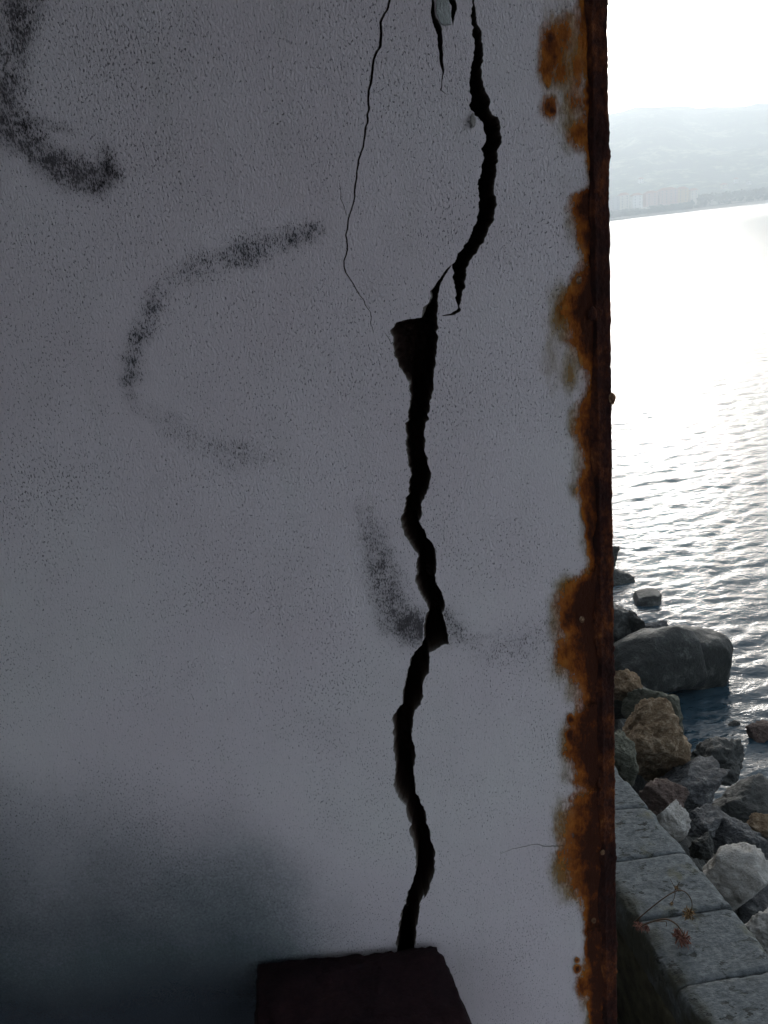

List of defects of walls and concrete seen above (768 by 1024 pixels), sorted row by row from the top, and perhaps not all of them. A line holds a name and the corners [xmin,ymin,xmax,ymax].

crack [339,0,502,951]
corrosion [538,0,604,1024]